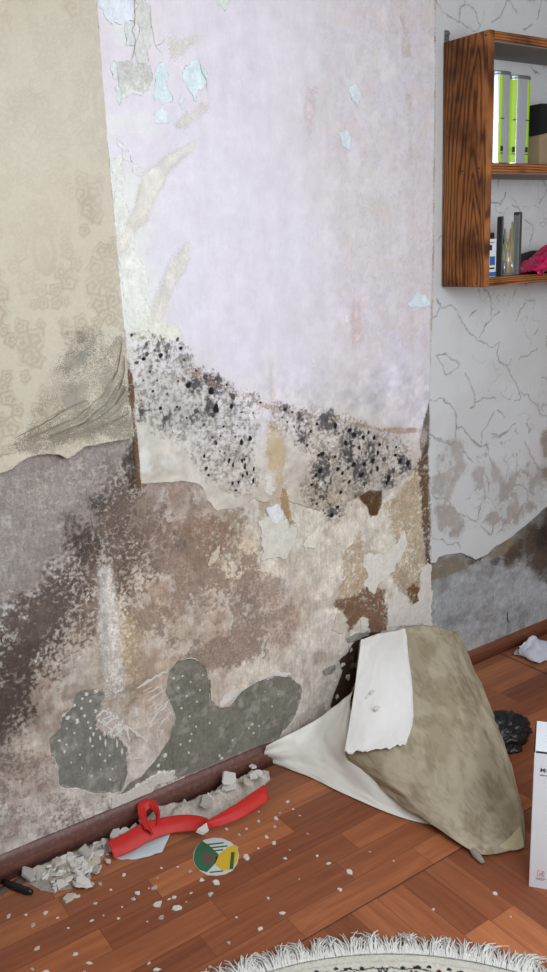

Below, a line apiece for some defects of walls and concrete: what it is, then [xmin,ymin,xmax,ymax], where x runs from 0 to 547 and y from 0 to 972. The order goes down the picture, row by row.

peeling [97,0,209,124]
peeling [110,139,183,344]
flaking render [208,545,220,567]
damp [0,325,547,838]
flaking render [258,474,321,561]
flaking render [322,530,434,708]
spalling [49,658,303,809]